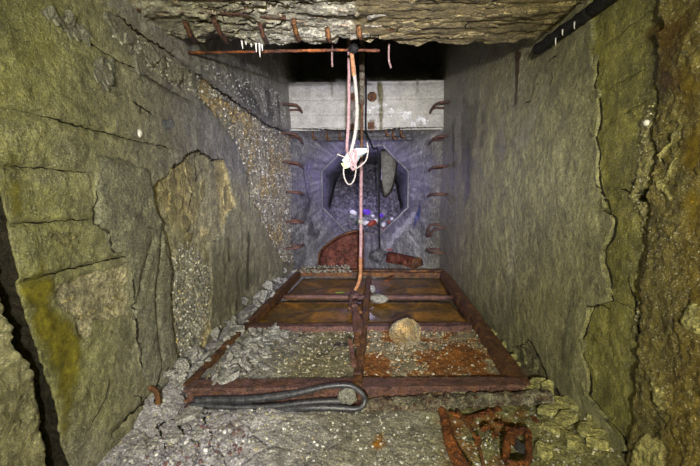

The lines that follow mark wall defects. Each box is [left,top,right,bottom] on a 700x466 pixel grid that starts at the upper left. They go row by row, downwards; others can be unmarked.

spalling [126,0,558,54]
crack [2,107,175,150]
crack [1,165,98,174]
leakage [20,278,80,430]
crack [0,196,213,466]